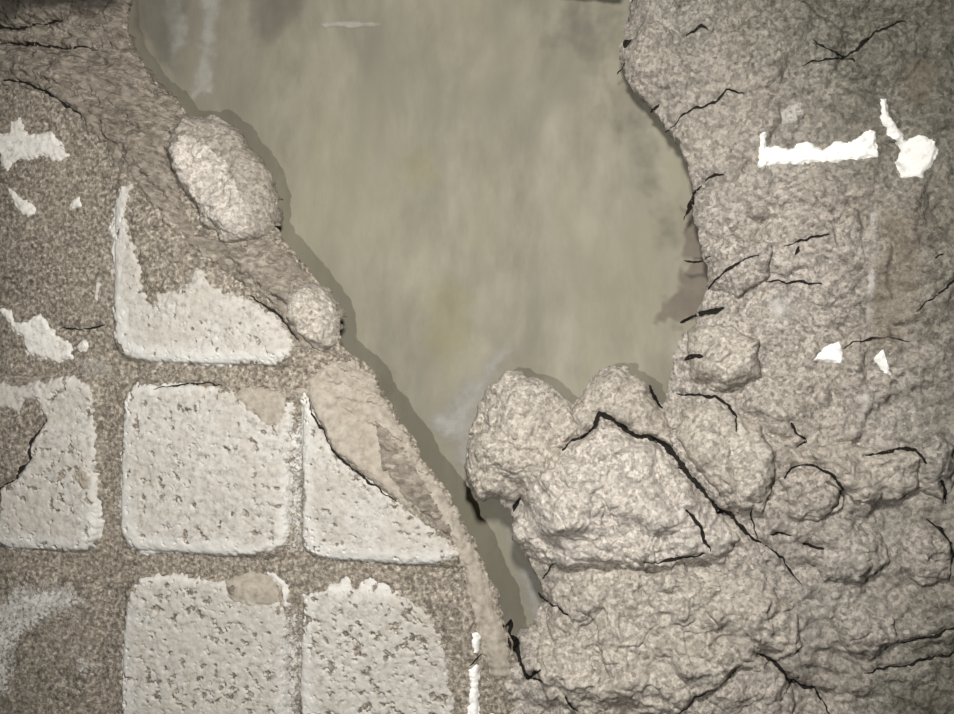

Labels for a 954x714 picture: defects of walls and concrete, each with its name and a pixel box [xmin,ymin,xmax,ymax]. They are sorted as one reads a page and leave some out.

spalling [0,0,314,369]
crack [650,88,745,133]
peeling [757,98,939,178]
crack [680,255,759,323]
crack [0,419,47,490]
peeling [118,359,511,714]
crack [309,397,398,502]
crack [562,411,824,585]
crack [649,385,738,431]
crack [783,422,844,515]
crack [865,446,954,558]
crack [756,653,830,714]